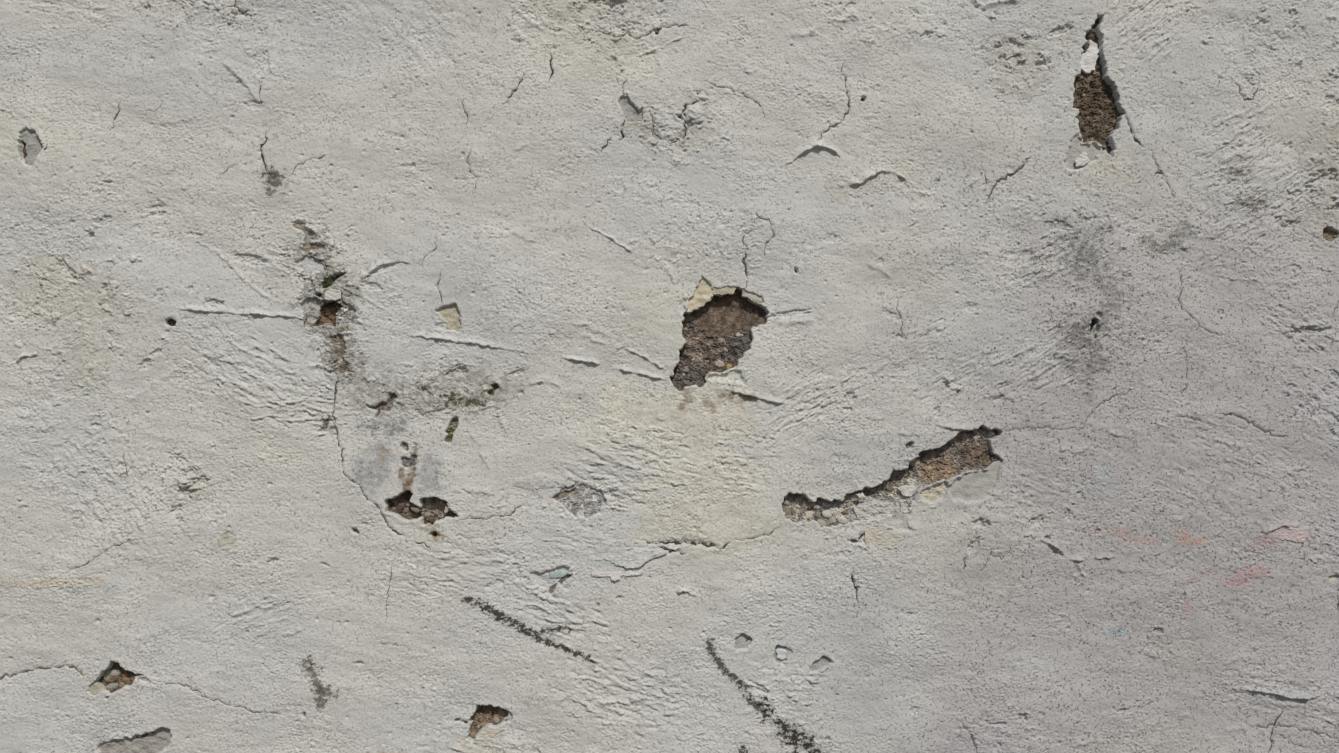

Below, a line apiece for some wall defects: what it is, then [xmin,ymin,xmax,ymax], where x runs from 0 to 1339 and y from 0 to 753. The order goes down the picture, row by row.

spalling [1064,18,1120,169]
crack [1121,113,1174,196]
spalling [670,278,767,391]
spalling [388,491,457,525]
spalling [782,427,1001,548]
spalling [90,662,150,695]
peeling [99,727,172,753]
spalling [469,705,512,741]